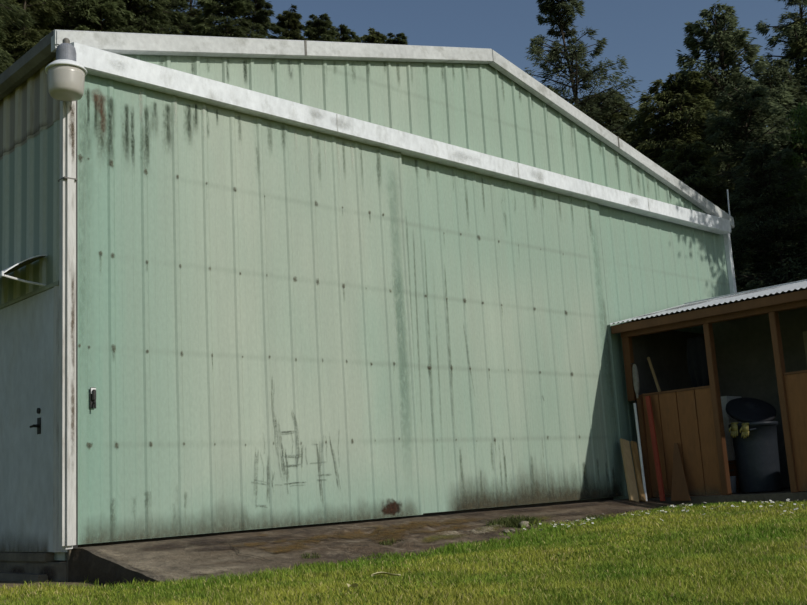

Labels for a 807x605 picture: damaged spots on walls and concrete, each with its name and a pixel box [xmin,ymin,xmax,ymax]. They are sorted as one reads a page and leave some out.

leakage [87,91,113,145]
leakage [125,107,134,154]
rust [382,500,400,515]
leakage [454,484,638,515]